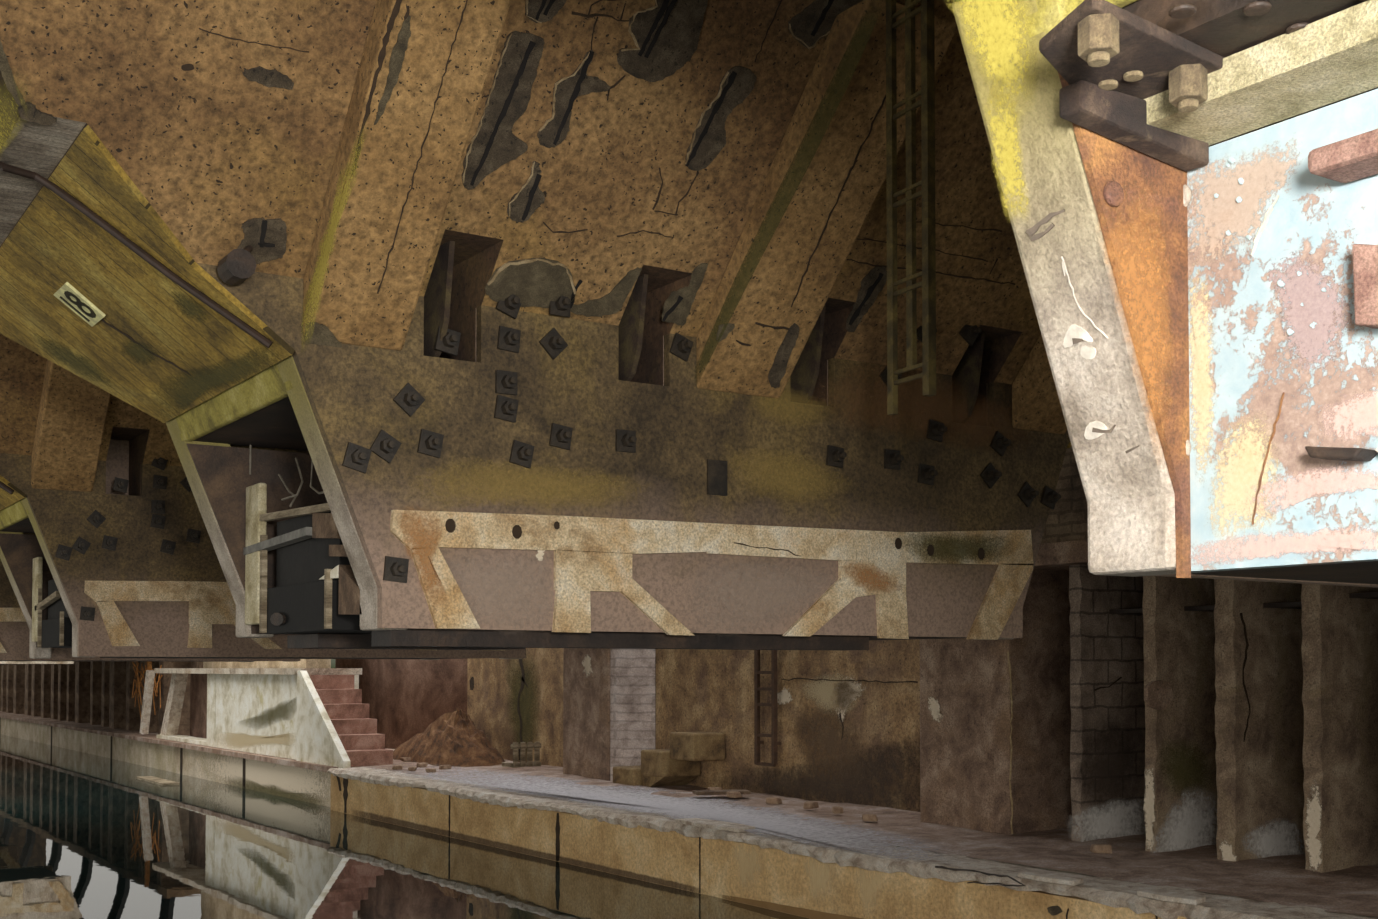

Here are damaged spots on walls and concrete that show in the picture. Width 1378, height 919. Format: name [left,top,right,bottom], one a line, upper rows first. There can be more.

crack [351,0,410,174]
crack [377,0,468,294]
spalling [462,0,610,223]
spalling [484,258,642,317]
spalling [616,0,708,82]
crack [736,95,1015,346]
rust [1107,210,1167,415]
peeling [1189,280,1378,564]
damp [730,712,920,811]
damp [1074,726,1217,852]
crack [1240,613,1251,742]
damp [1248,821,1302,858]